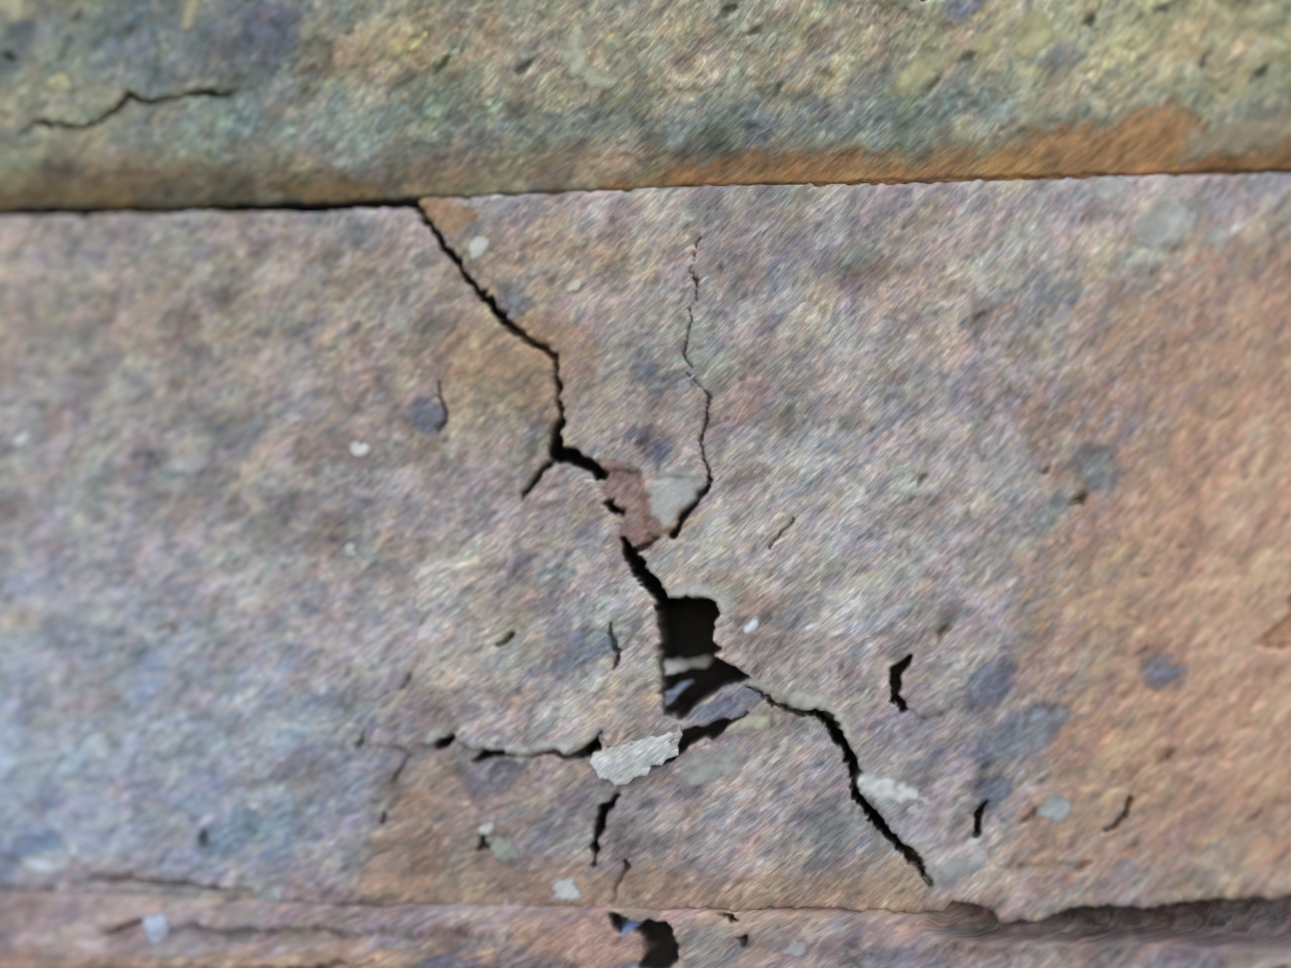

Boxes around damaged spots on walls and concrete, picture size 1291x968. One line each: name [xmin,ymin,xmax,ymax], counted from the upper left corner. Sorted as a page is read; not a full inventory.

crack [21,91,231,136]
crack [417,209,712,611]
crack [497,633,515,646]
crack [610,624,621,667]
crack [890,655,912,711]
crack [437,731,602,762]
crack [664,686,932,885]
crack [592,794,630,892]
peeling [610,913,747,968]